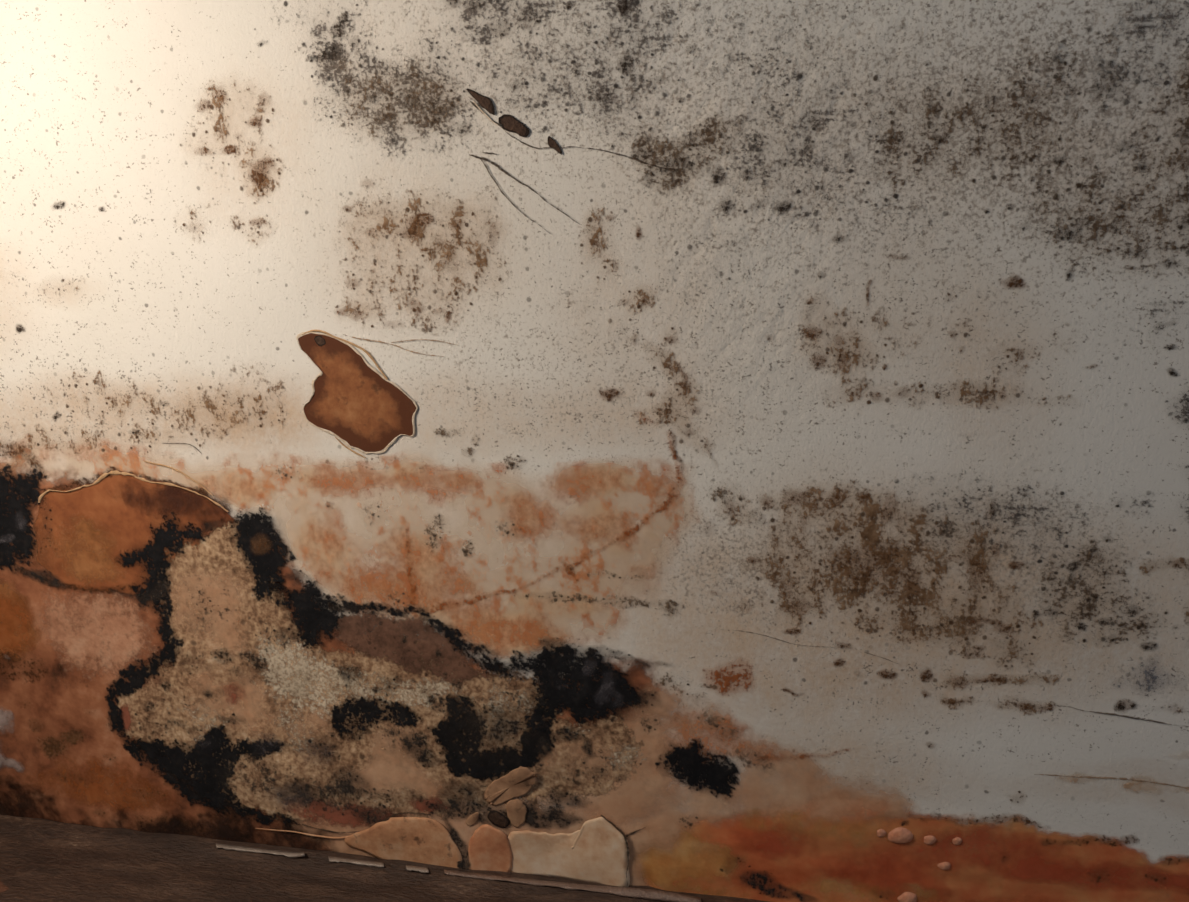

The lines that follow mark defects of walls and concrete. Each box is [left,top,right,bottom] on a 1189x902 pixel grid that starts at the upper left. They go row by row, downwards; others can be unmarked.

leakage [298,0,1189,281]
peeling [296,329,455,458]
leakage [335,183,508,333]
leakage [624,289,658,321]
leakage [639,327,713,462]
leakage [798,296,1040,409]
leakage [1006,276,1023,289]
peeling [20,461,234,595]
rust [608,441,682,545]
rust [407,567,515,613]
peeling [344,766,630,887]